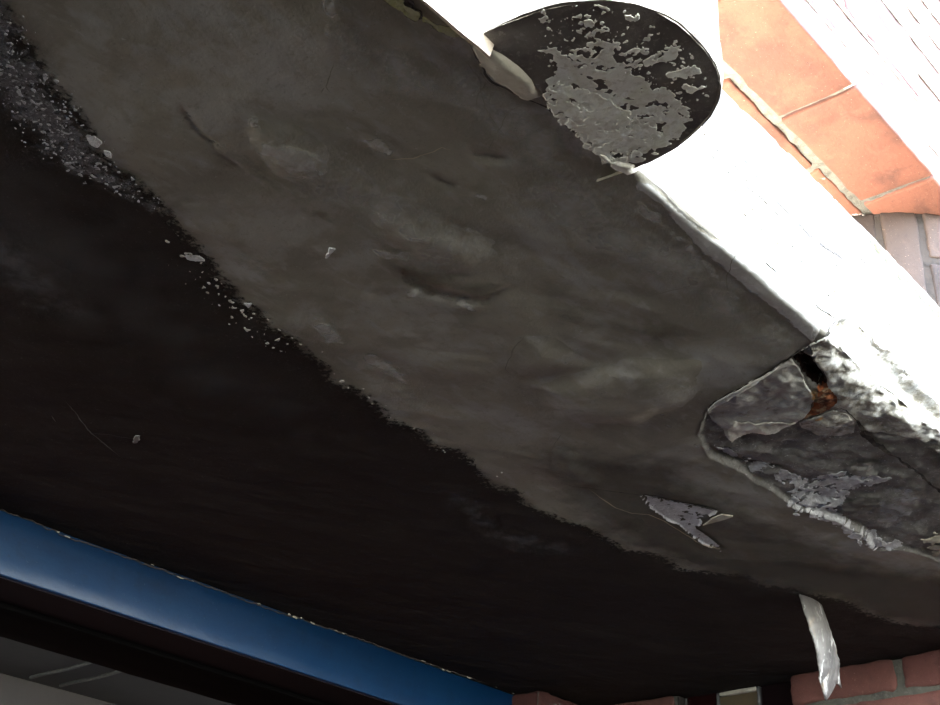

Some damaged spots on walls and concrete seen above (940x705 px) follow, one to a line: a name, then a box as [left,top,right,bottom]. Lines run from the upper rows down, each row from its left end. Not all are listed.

damp [0,5,160,211]
crack [465,45,592,149]
peeling [538,4,940,357]
corrosion [793,352,837,421]
crack [705,317,940,414]
spalling [640,495,733,552]
damp [711,445,903,551]
spalling [698,318,940,563]
crack [824,403,940,493]